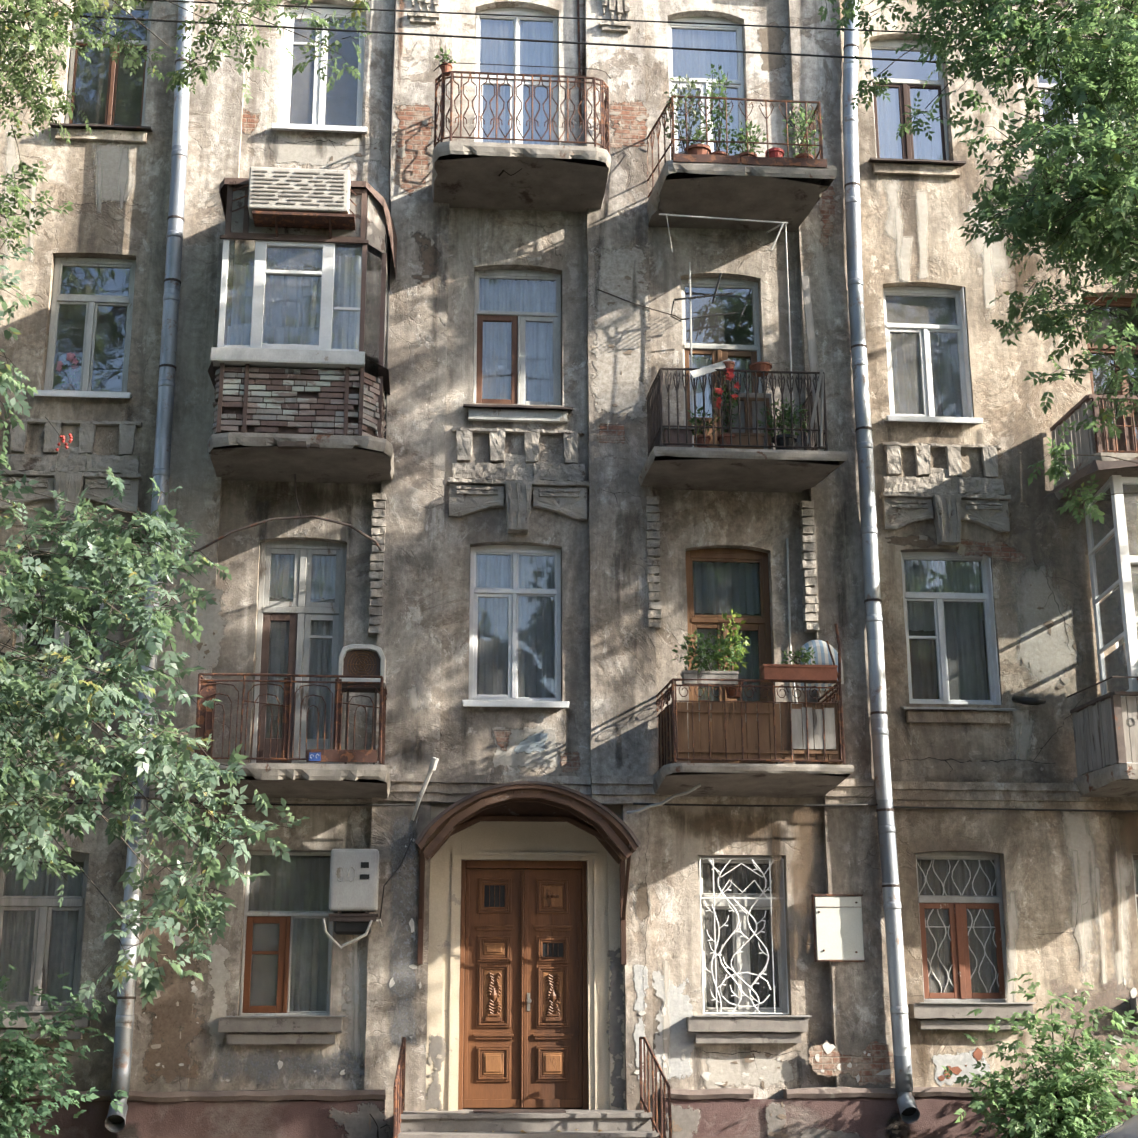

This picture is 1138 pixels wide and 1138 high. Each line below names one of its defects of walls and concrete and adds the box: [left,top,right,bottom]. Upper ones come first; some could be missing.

spalling [242,108,261,135]
spalling [609,99,649,149]
spalling [266,103,434,196]
flaking render [188,589,227,673]
peeling [492,725,581,773]
flaking render [135,896,368,1087]
peeling [607,948,794,1109]
spalling [808,1040,895,1086]
peeling [932,1048,991,1086]